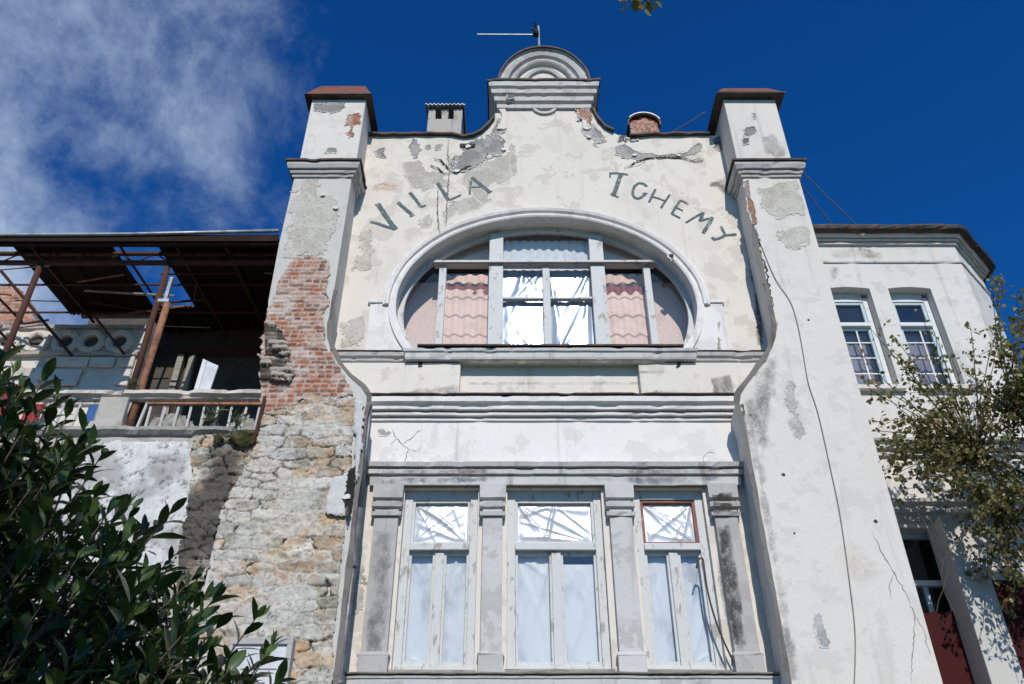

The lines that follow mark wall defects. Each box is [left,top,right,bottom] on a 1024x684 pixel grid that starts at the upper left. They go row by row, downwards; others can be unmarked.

flaking render [313,101,362,138]
flaking render [575,108,722,160]
flaking render [401,117,518,229]
flaking render [743,180,811,250]
flaking render [176,178,367,684]
flaking render [784,380,807,439]
damp [719,526,742,644]
flaking render [813,612,831,648]
crack [877,541,931,681]